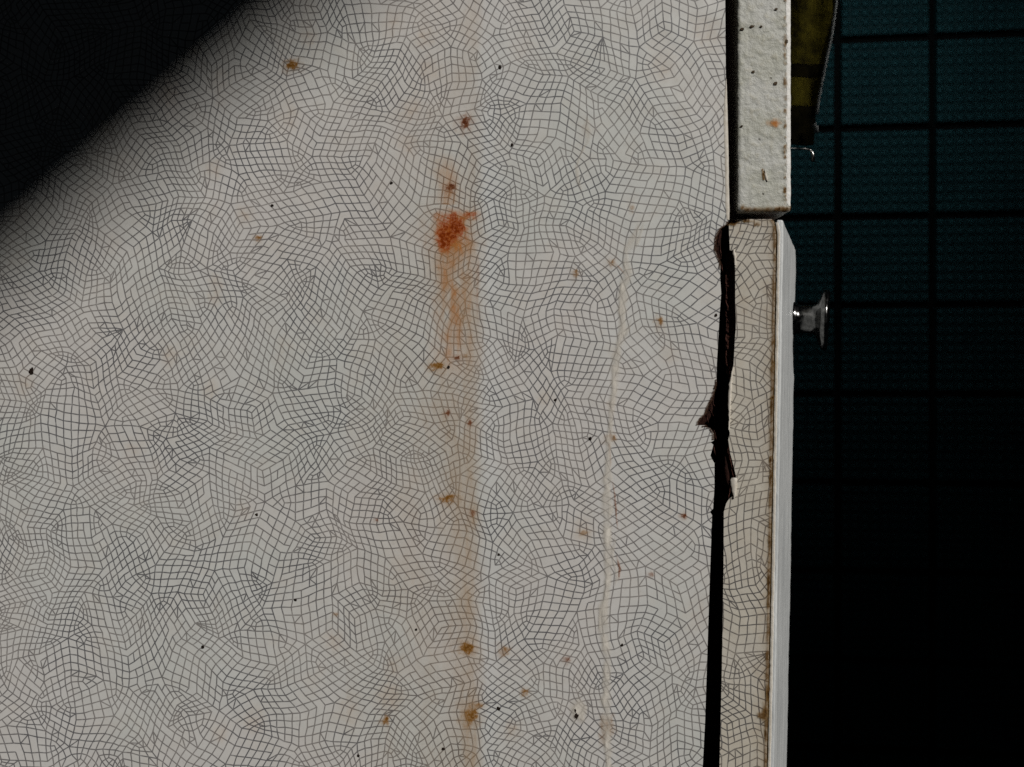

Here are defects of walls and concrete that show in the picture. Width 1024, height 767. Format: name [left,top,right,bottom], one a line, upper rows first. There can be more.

corrosion [436,212,475,322]
peeling [696,379,717,456]
corrosion [465,704,482,724]